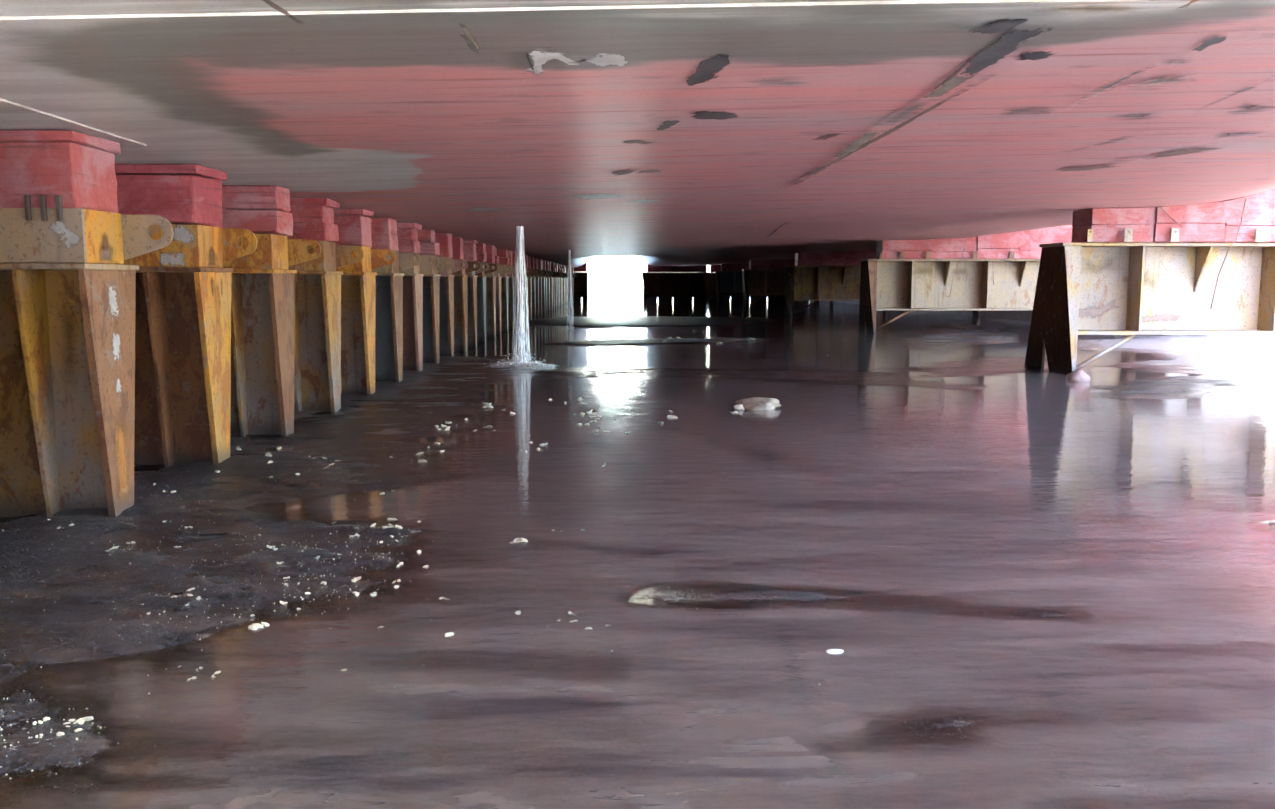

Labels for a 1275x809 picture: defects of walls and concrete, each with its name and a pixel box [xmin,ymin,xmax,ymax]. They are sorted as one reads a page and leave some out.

peeling [525,49,628,74]
spalling [687,54,729,85]
peeling [1017,51,1053,60]
rust [209,249,222,322]
rust [116,428,128,495]